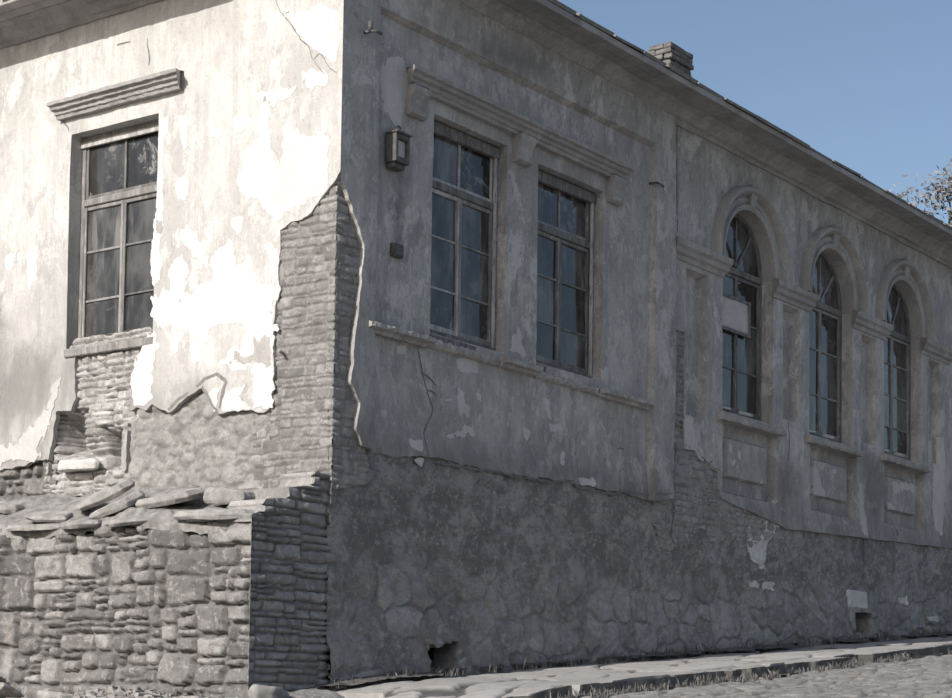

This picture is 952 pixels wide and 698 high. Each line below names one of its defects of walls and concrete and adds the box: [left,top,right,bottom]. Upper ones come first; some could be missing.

crack [276,2,335,74]
flaking render [380,56,408,127]
flaking render [0,3,371,526]
crack [418,347,675,543]
flaking render [646,331,774,553]